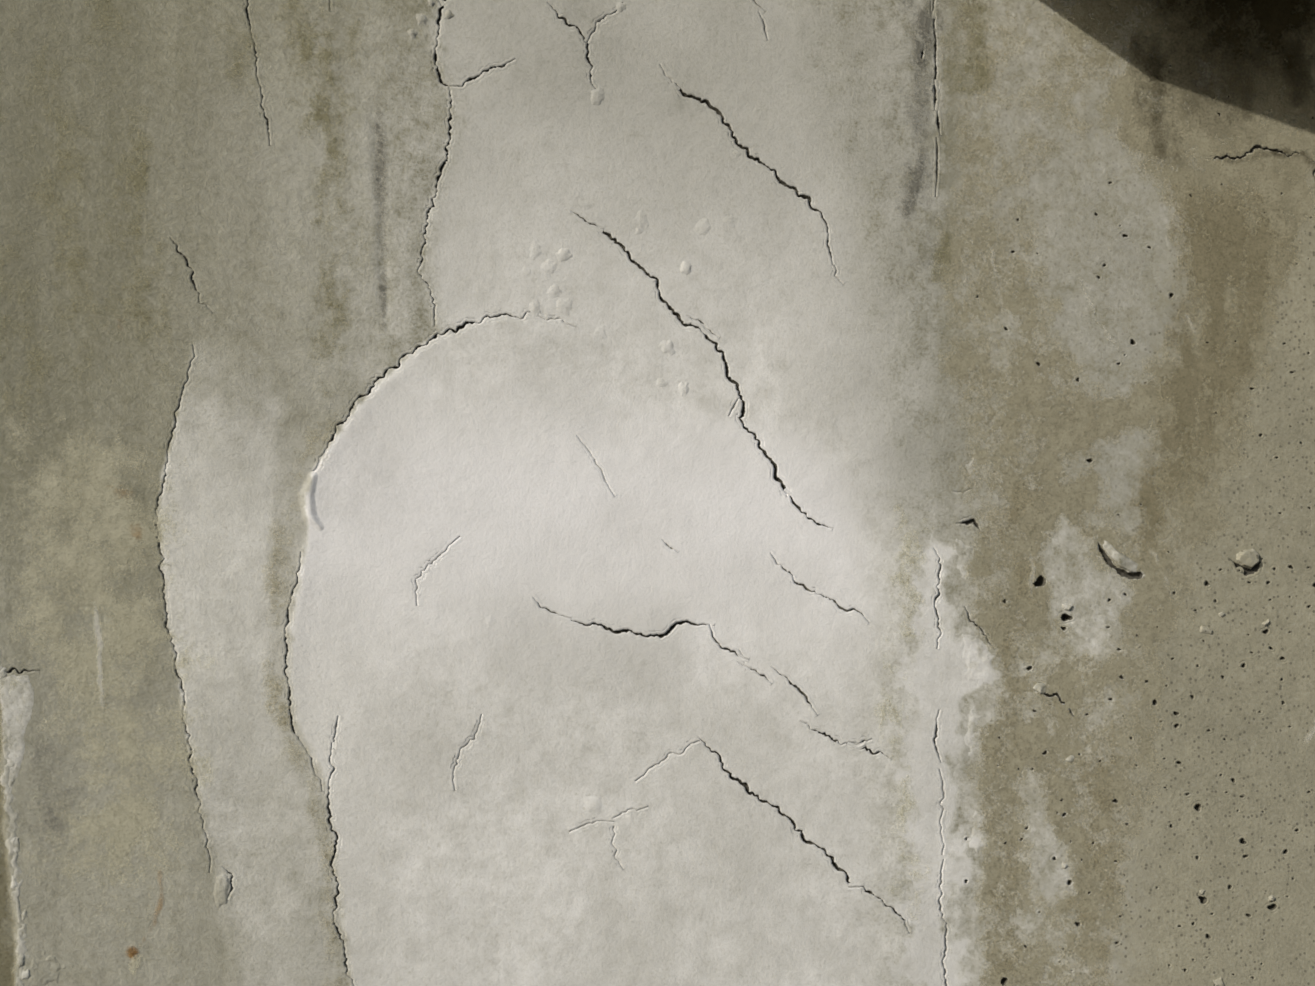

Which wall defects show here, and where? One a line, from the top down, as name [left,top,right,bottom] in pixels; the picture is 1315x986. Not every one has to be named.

leakage [11,429,211,885]
leakage [276,0,360,229]
leakage [373,109,387,252]
crack [309,0,577,473]
crack [567,206,834,532]
crack [530,594,893,762]
crack [656,62,846,287]
leakage [897,0,1315,986]
spalling [1093,538,1145,583]
leakage [0,781,17,986]
peeling [0,649,67,986]
crack [568,709,951,986]